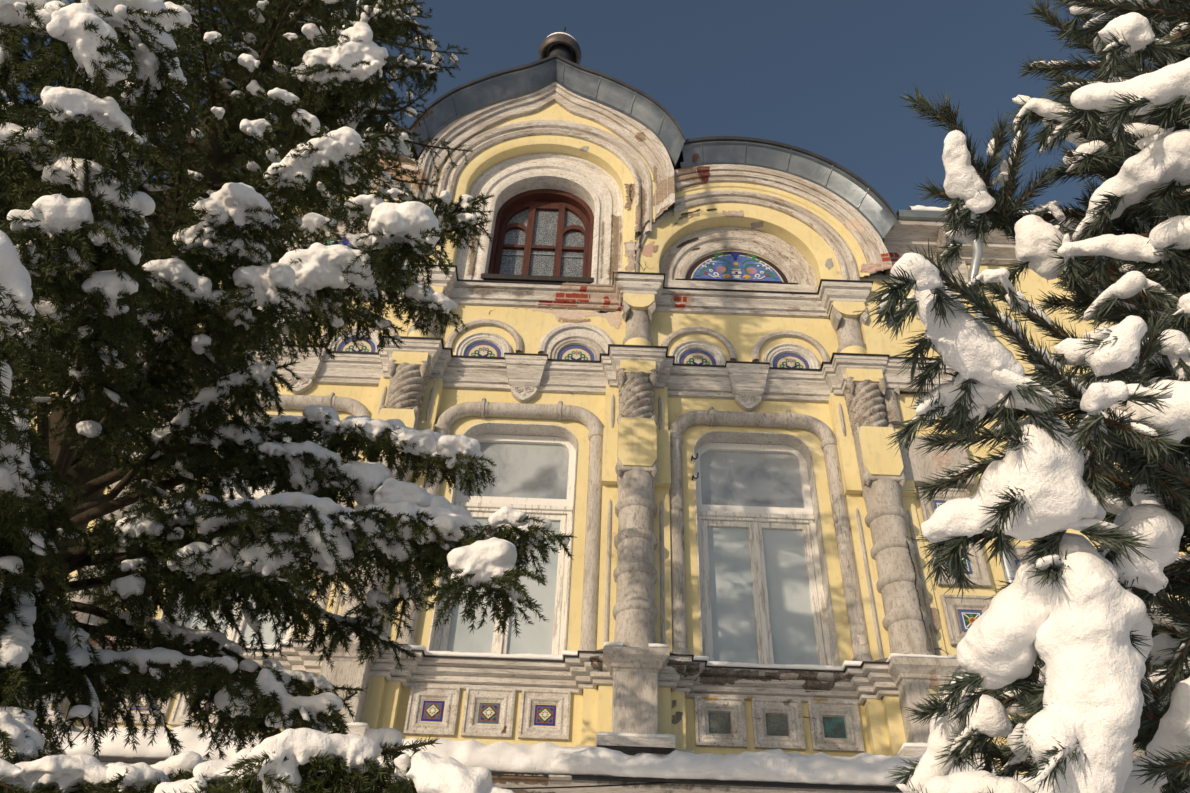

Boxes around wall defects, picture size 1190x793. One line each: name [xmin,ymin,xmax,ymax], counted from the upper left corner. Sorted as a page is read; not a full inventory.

peeling [365,81,900,279]
spalling [513,282,624,329]
spalling [671,291,694,311]